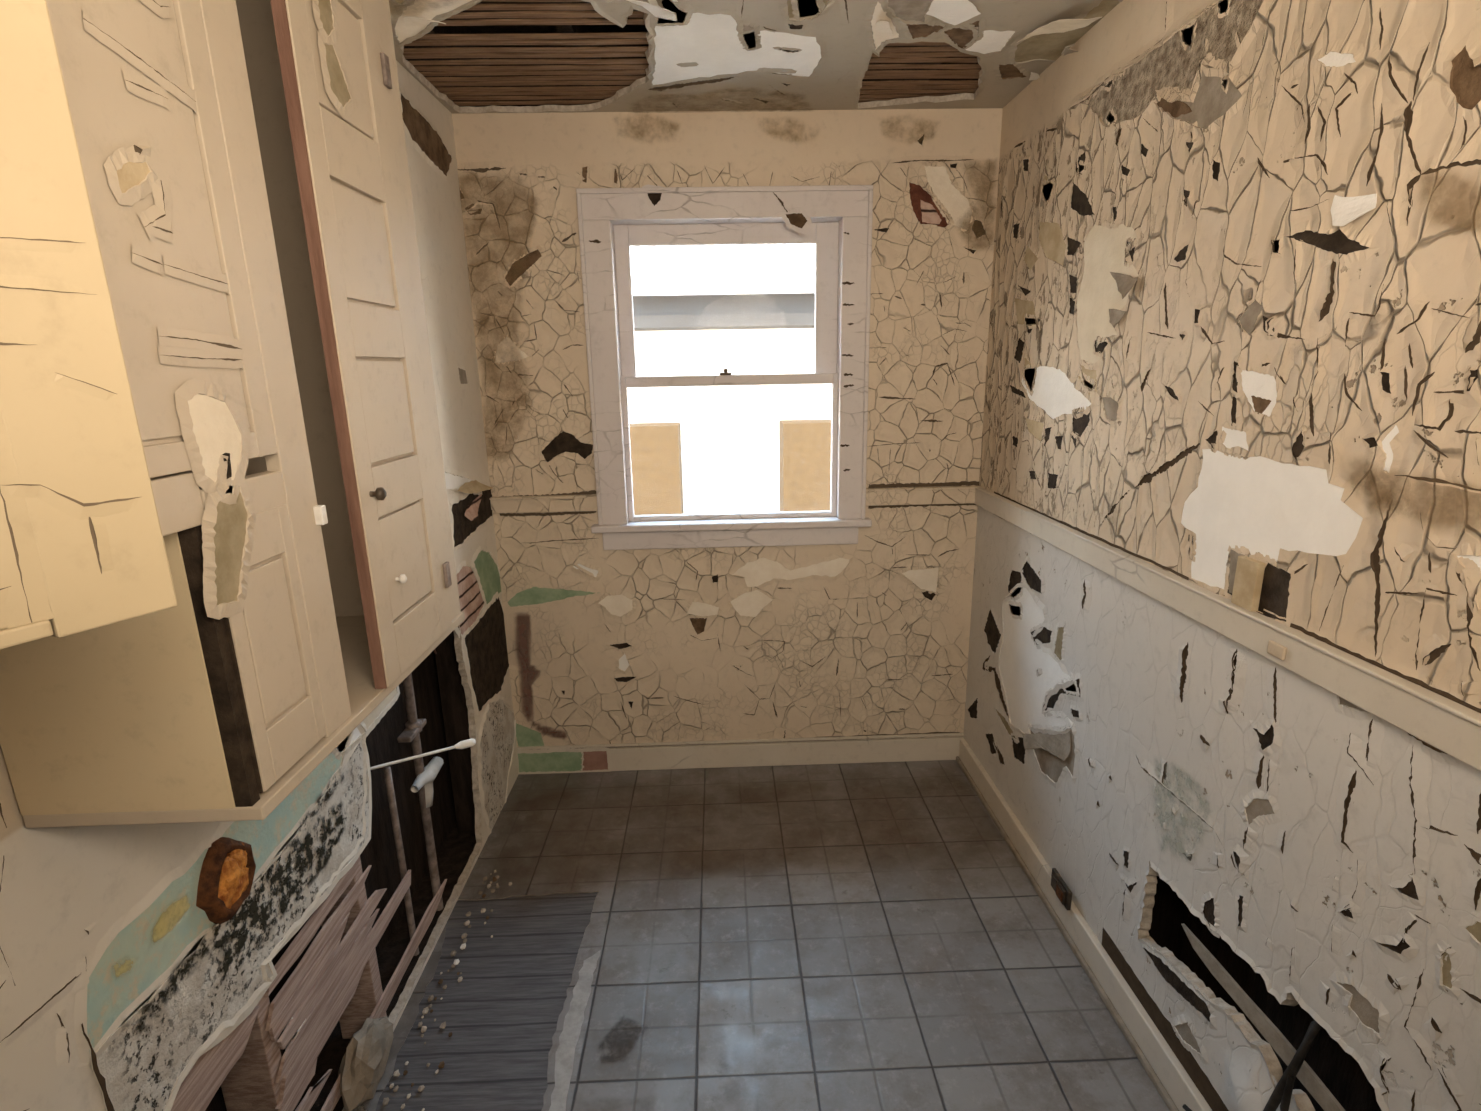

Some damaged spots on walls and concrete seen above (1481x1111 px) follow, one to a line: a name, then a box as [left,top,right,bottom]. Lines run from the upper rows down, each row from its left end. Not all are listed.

peeling [391,0,836,182]
water stain [459,176,535,281]
crack [0,407,140,629]
peeling [175,378,256,620]
crack [499,464,599,547]
crack [777,0,1481,1111]
crack [0,921,115,1111]
corrosion [218,842,249,909]
water stain [126,775,344,1037]
peeling [74,466,640,1111]
peeling [967,556,1084,789]
flaking render [1119,846,1391,1111]